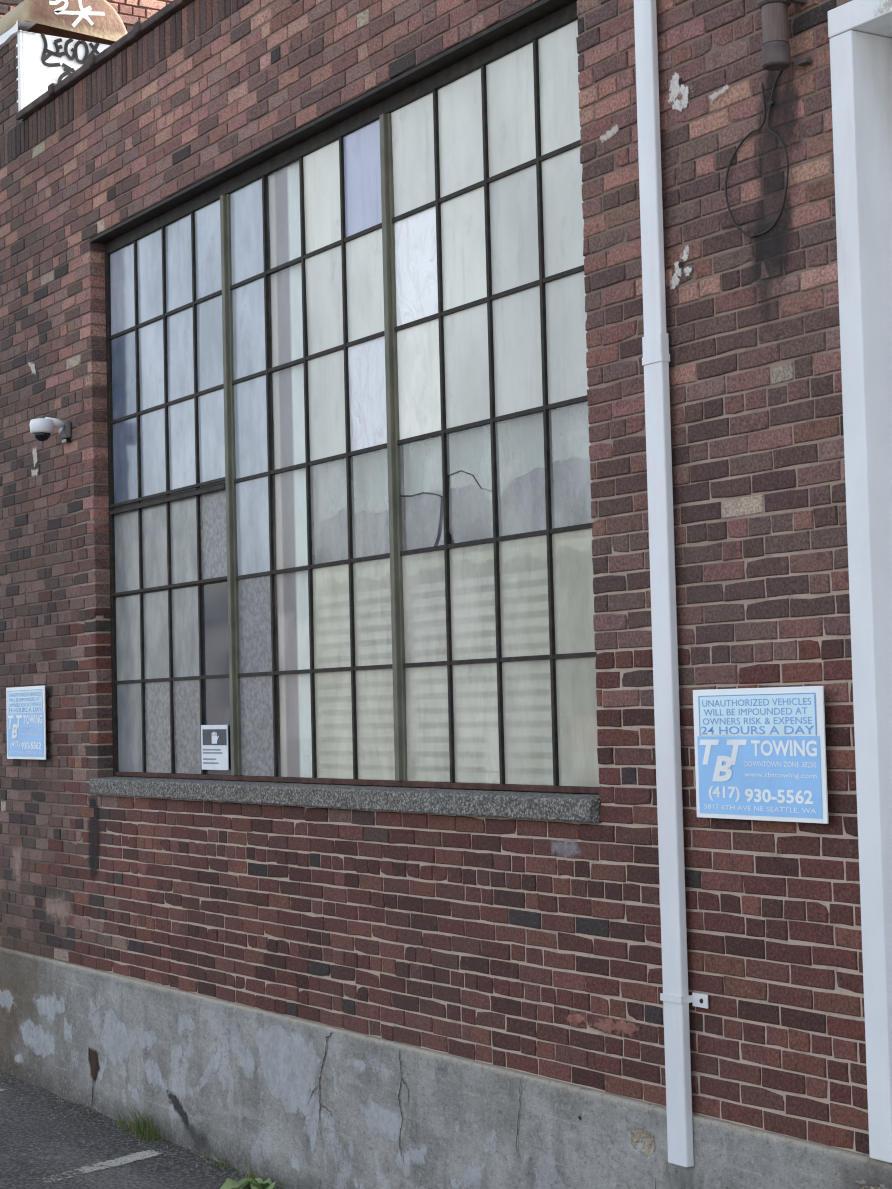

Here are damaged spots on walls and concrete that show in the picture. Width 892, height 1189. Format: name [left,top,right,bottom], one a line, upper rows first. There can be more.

peeling [667,72,692,111]
peeling [670,245,692,289]
corrosion [88,1048,100,1093]
leakage [166,1090,206,1146]
crack [307,1032,332,1143]
crack [398,1048,409,1167]